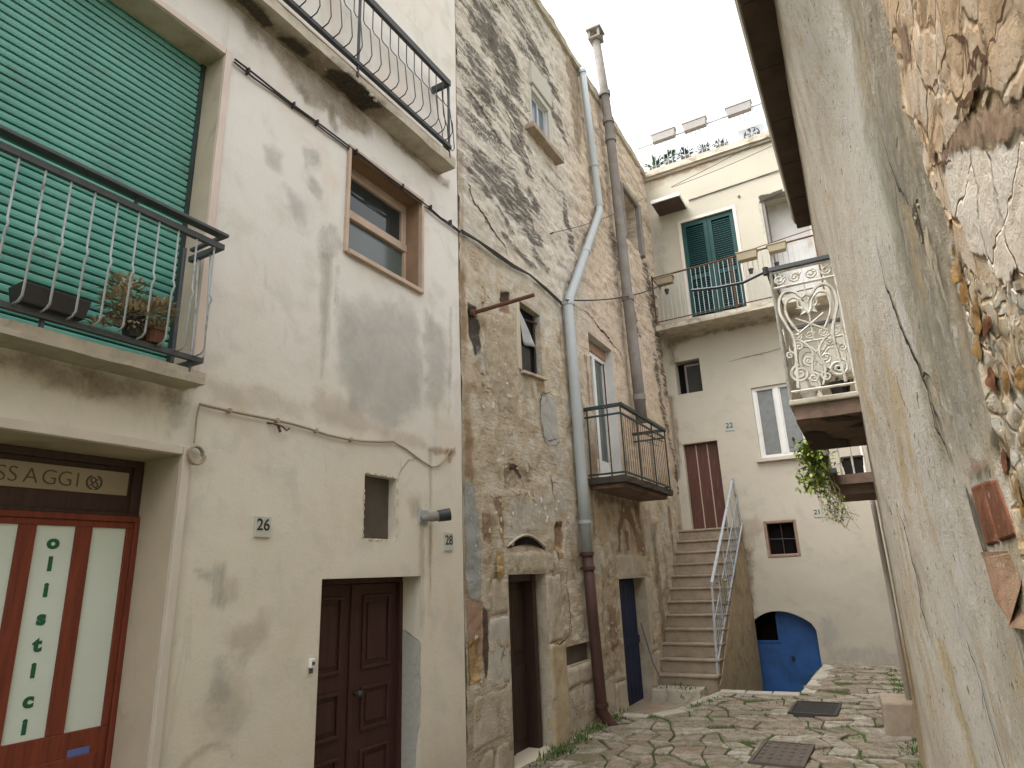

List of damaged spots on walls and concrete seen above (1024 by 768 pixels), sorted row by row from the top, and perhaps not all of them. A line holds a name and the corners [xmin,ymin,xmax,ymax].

crack [467,179,508,256]
crack [882,137,909,206]
crack [875,240,951,461]
flaking render [881,0,1024,566]